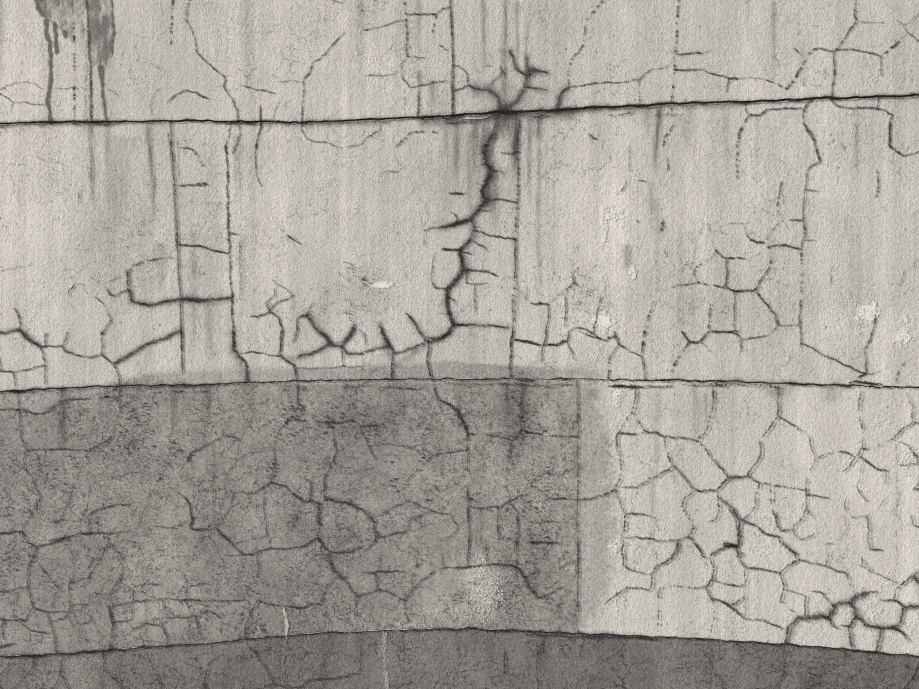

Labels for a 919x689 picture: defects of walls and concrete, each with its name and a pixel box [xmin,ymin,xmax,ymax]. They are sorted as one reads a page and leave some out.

crack [0,0,919,475]
crack [0,504,362,689]
crack [178,439,562,622]
crack [373,295,919,657]